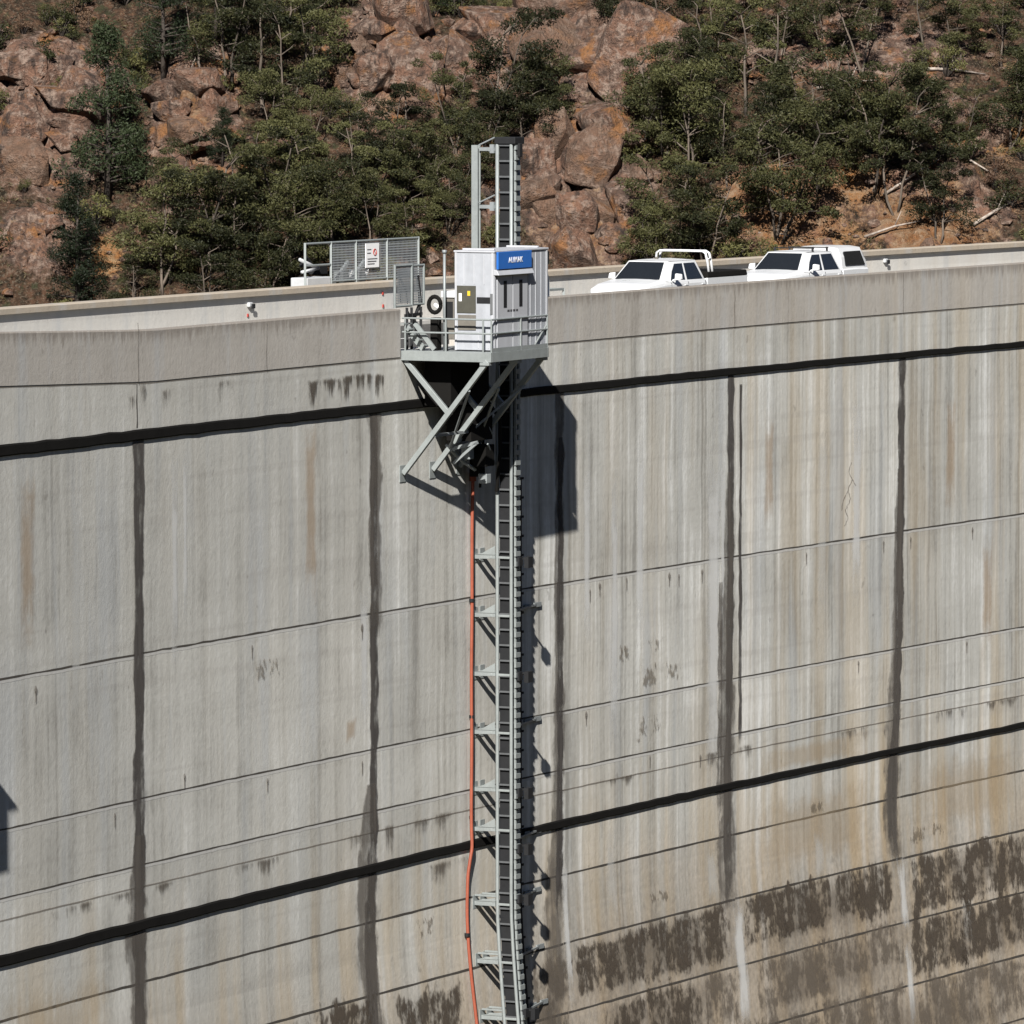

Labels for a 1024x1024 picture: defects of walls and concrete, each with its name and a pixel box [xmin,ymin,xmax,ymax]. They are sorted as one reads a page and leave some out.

water stain [119,440,146,1024]
water stain [309,374,384,403]
water stain [356,413,393,1024]
crack [0,462,1024,684]
water stain [708,375,751,896]
efflorescence [736,916,748,1011]
water stain [883,358,906,855]